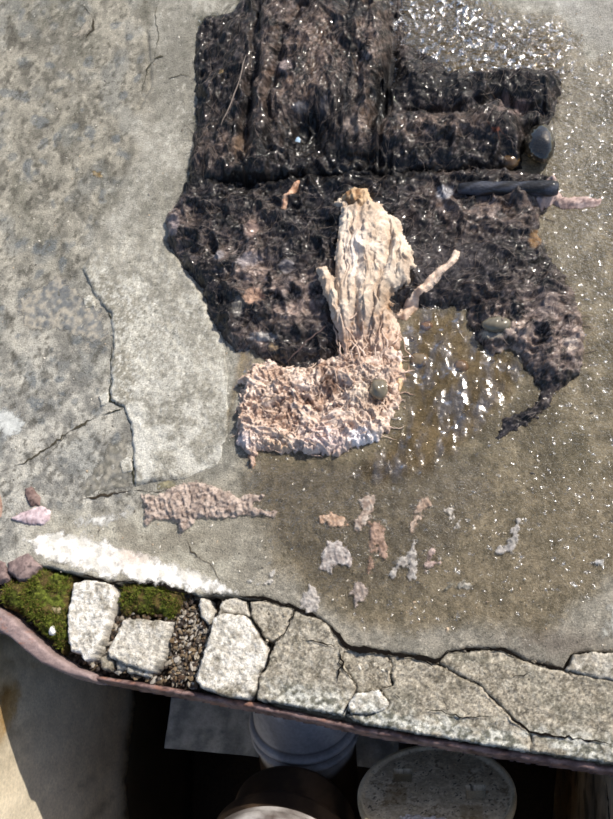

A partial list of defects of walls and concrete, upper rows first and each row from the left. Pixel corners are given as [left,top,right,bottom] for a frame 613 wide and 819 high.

water stain [390,0,613,242]
crack [14,312,132,467]
crack [59,453,167,507]
water stain [23,511,232,594]
crack [84,543,613,713]
crack [427,681,608,744]